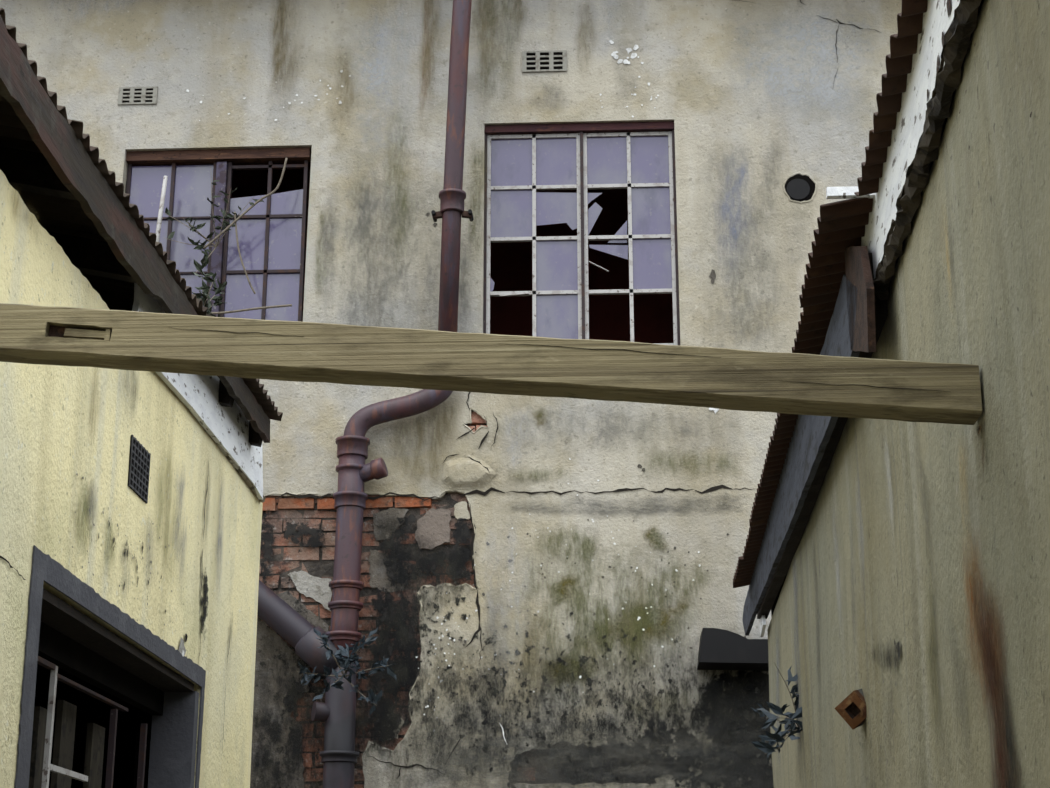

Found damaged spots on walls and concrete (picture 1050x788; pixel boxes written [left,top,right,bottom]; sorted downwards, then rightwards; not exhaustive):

crack [800,0,882,85]
spalling [463,407,489,434]
crack [268,491,333,499]
damp [200,568,209,640]
spalling [277,571,332,632]
spalling [362,489,502,758]
crack [368,485,756,659]
damp [355,514,778,788]
spalling [250,621,310,788]